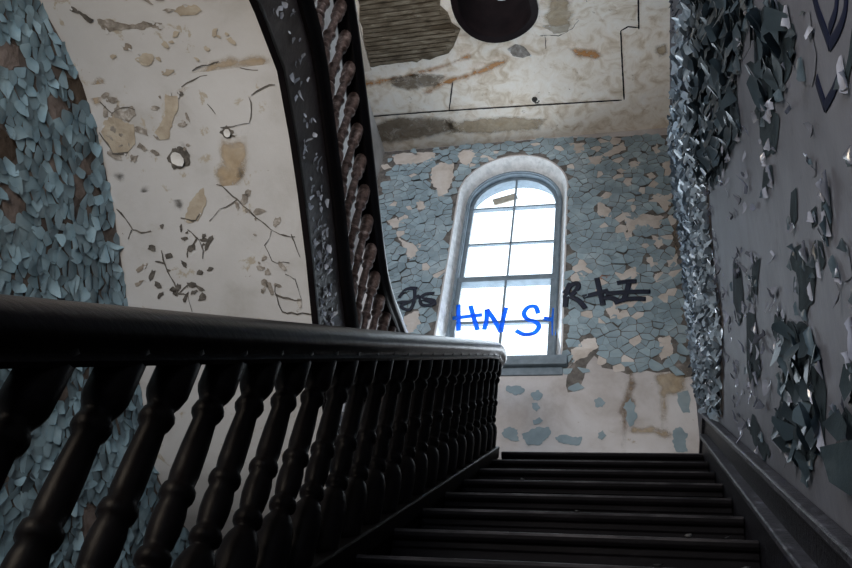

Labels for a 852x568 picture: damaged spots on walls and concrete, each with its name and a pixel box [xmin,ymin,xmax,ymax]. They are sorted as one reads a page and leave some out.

peeling [0,0,214,306]
crack [181,61,219,87]
crack [207,67,275,128]
spalling [358,0,460,67]
crack [116,209,151,239]
crack [155,250,203,311]
crack [181,184,311,315]
peeling [303,113,338,326]
peeling [377,0,852,496]
peeling [0,367,93,565]
peeling [49,383,144,568]
peeling [114,466,161,568]